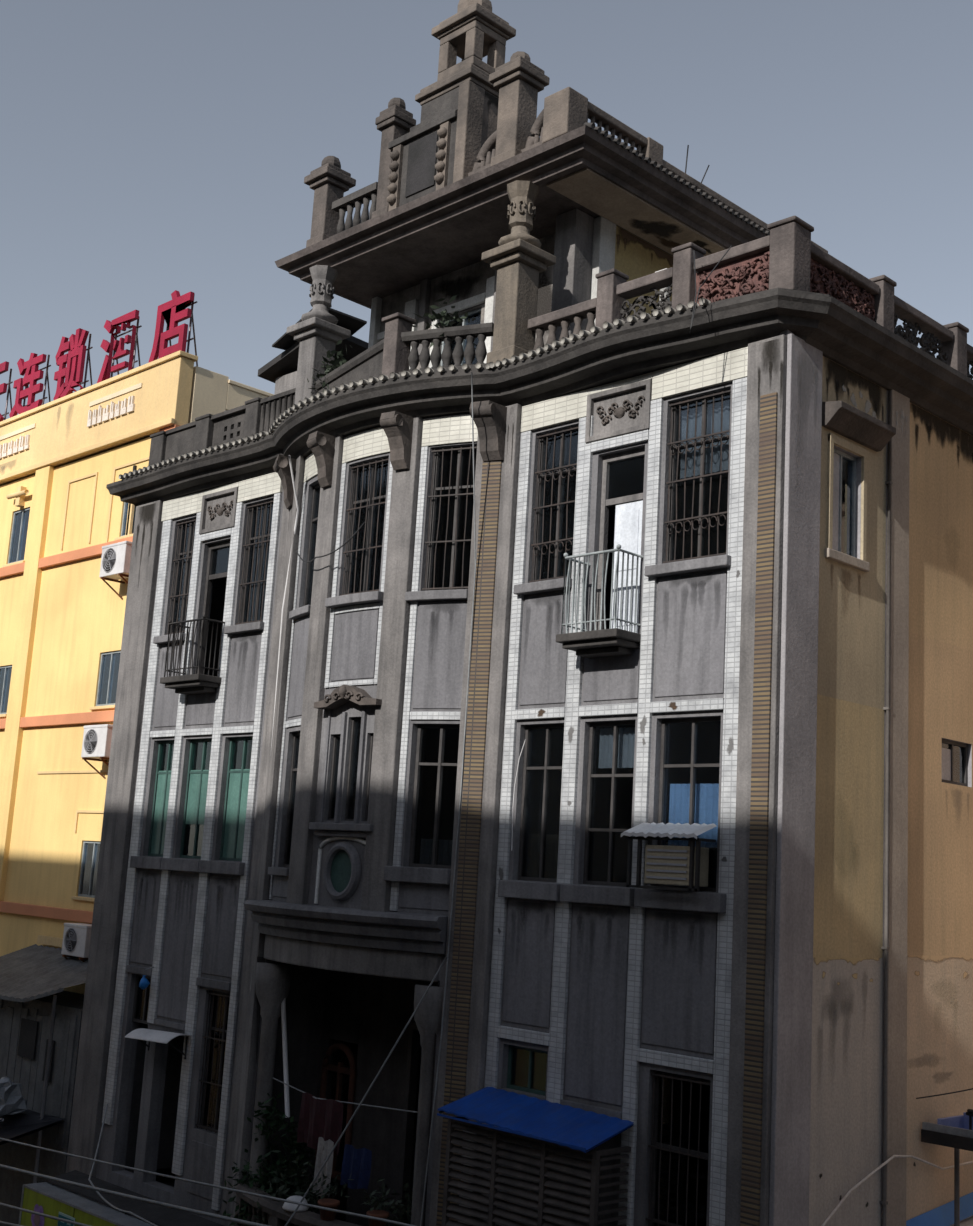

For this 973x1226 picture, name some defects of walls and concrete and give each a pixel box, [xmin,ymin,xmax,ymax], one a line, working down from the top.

damp [617,220,680,267]
damp [826,359,884,421]
damp [911,403,973,461]